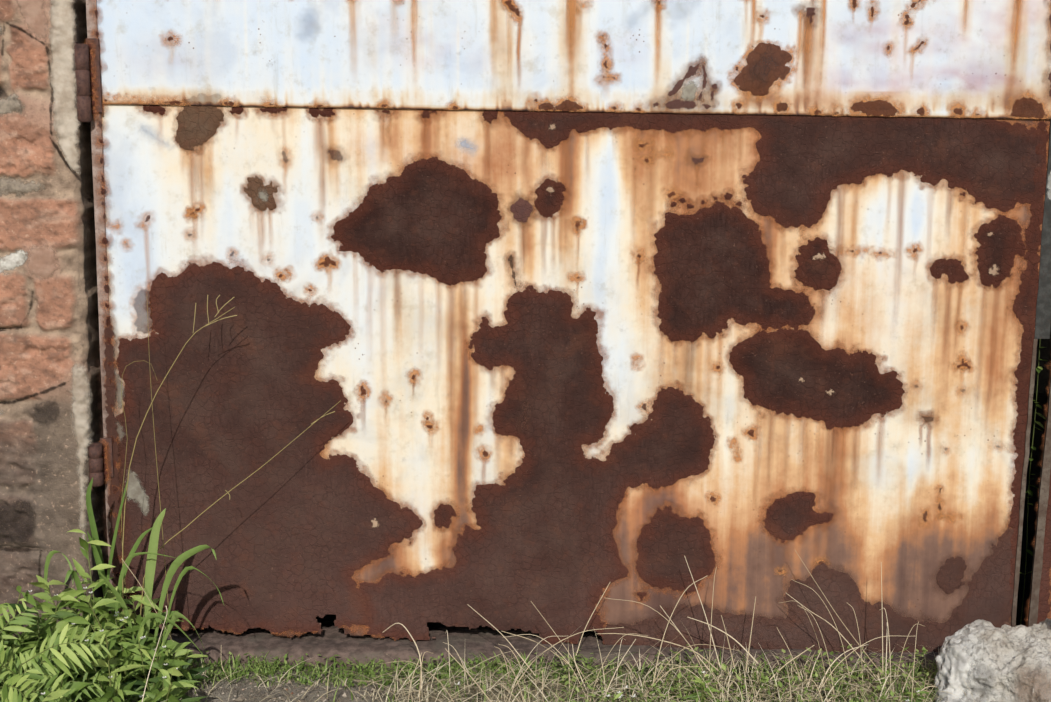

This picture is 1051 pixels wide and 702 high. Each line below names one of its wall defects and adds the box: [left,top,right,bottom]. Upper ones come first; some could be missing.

rust [494,0,521,61]
rust [568,0,585,32]
rust [598,34,619,83]
rust [729,7,816,99]
rust [849,0,878,20]
rust [901,0,925,27]
rust [102,59,1051,653]